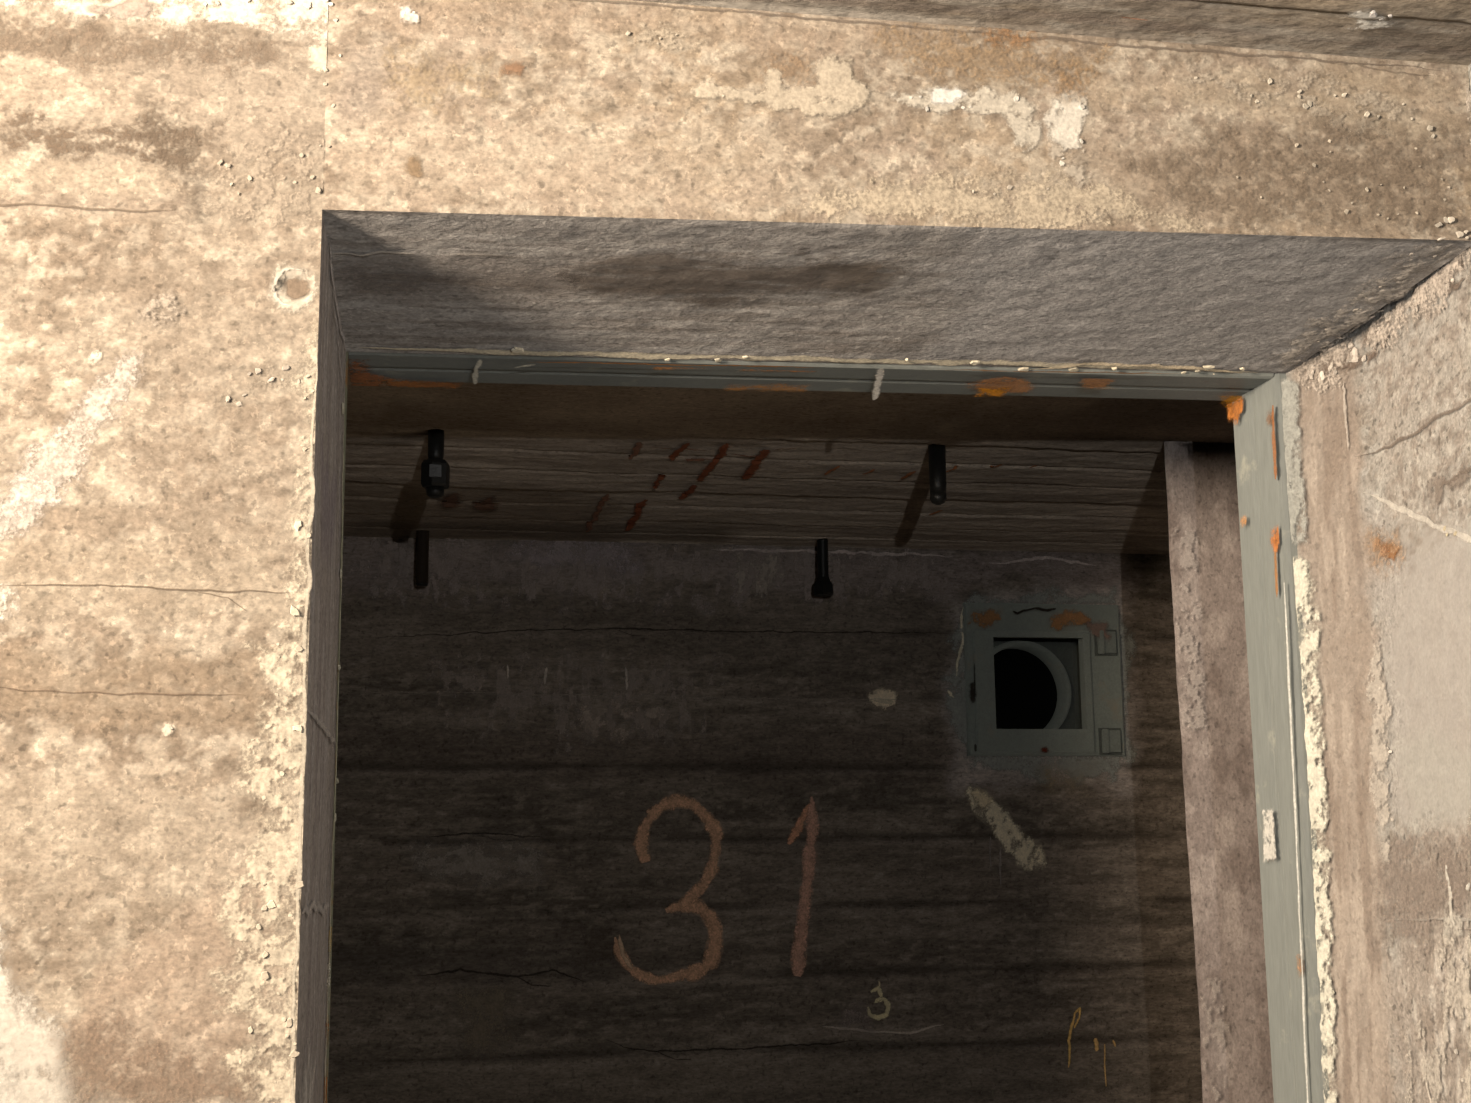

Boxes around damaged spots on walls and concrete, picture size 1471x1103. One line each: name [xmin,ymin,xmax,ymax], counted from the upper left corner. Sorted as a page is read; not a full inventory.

corrosion [967,369,1177,397]
crack [1361,397,1471,456]
crack [1364,467,1471,543]